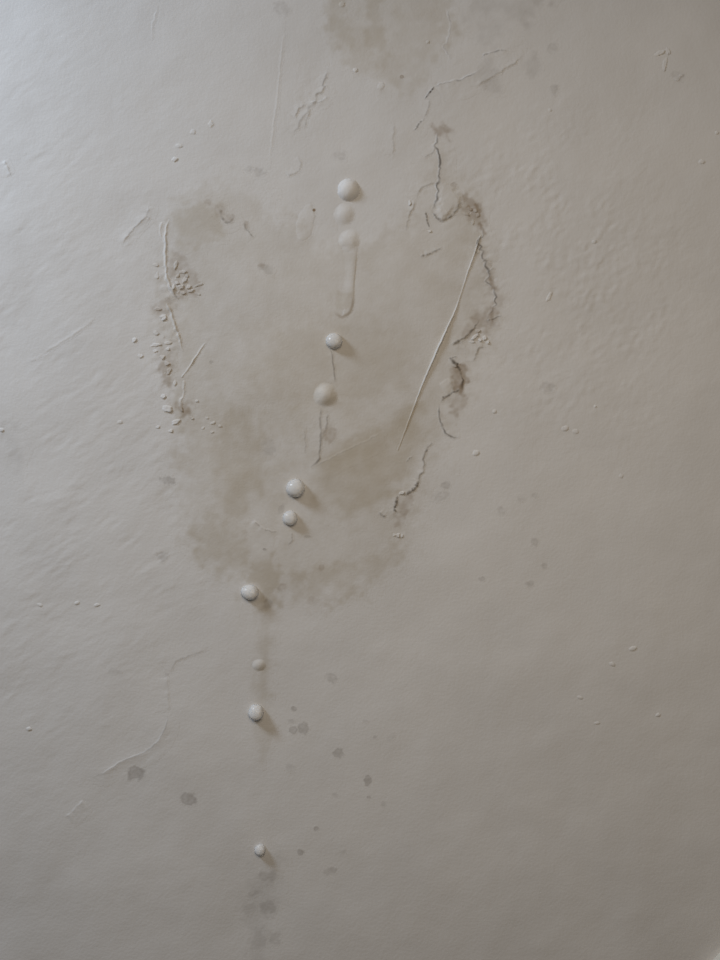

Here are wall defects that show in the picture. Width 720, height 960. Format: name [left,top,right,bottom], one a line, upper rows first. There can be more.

crack [397,130,460,231]
crack [475,222,510,331]
damp [130,156,522,770]
crack [378,354,465,522]